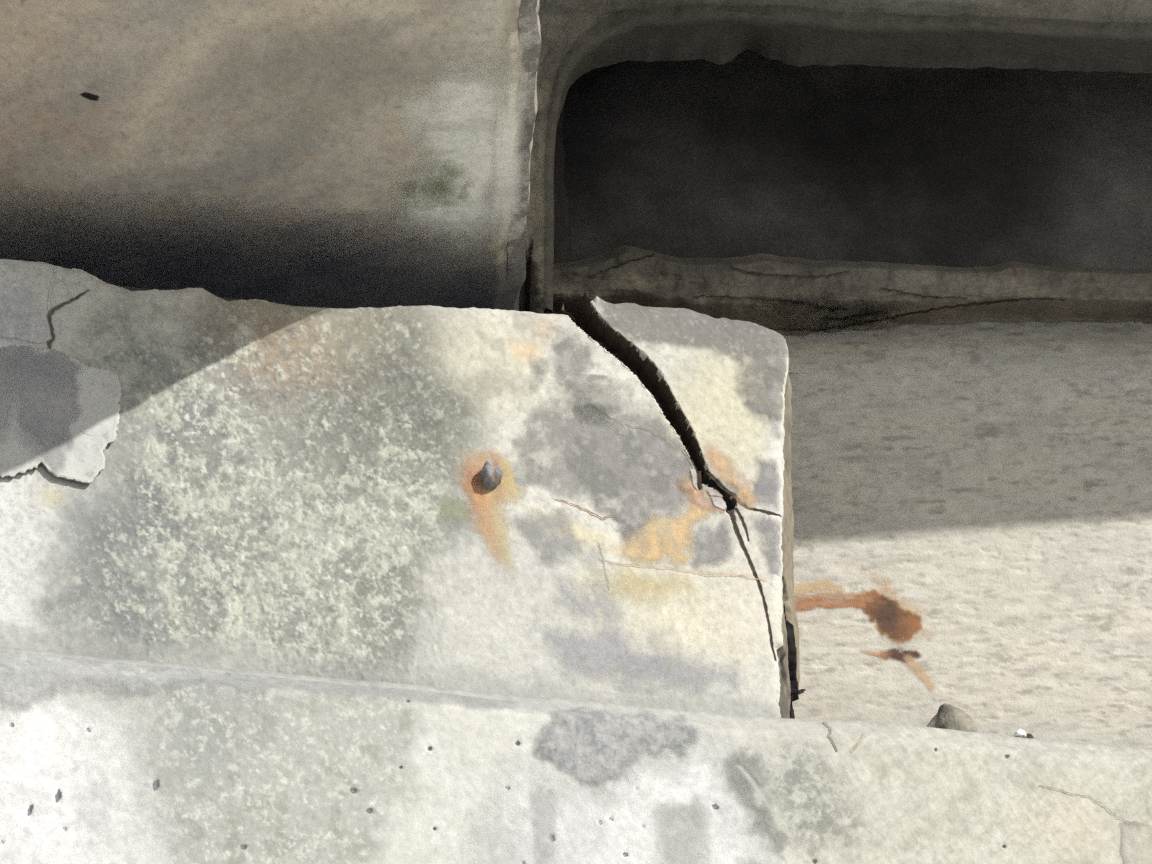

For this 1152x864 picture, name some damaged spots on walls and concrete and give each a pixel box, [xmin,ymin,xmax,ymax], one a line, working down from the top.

peeling [0,345,121,484]
rust [467,457,518,551]
water stain [554,338,604,382]
water stain [522,412,694,540]
crack [554,253,782,661]
rust [624,478,724,563]
rust [706,449,756,506]
water stain [738,354,786,421]
water stain [755,462,779,504]
water stain [758,520,780,573]
rust [795,580,934,690]
water stain [490,709,786,864]